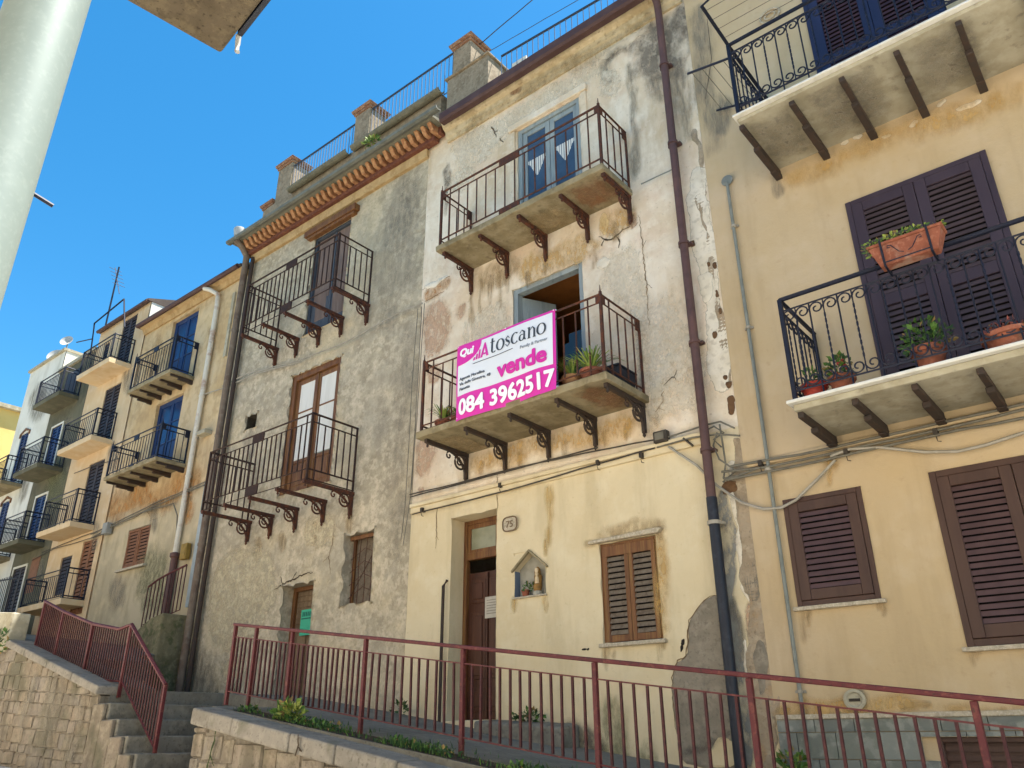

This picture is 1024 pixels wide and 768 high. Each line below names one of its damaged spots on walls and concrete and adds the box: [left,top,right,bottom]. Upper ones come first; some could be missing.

leakage [602,5,728,132]
crack [600,217,652,330]
peeling [597,129,735,420]
crack [274,524,335,590]
spalling [672,596,735,768]